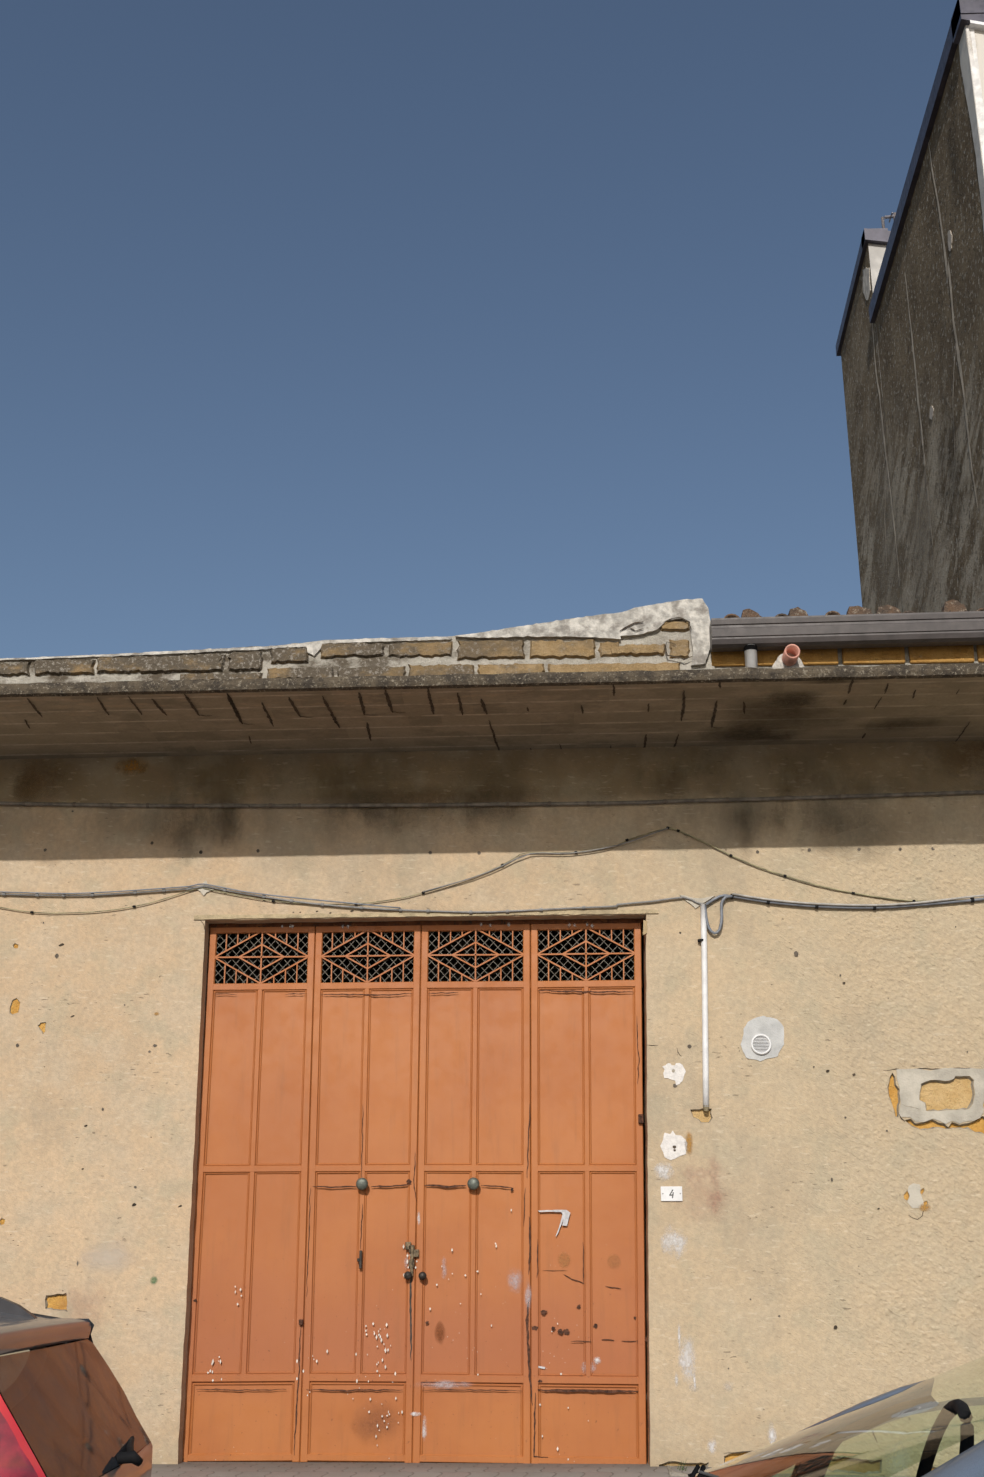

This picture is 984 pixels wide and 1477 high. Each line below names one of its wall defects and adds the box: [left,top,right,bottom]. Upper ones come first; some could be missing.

spalling [886,1073,984,1134]
spalling [659,1452,748,1467]
spalling [827,1457,882,1475]